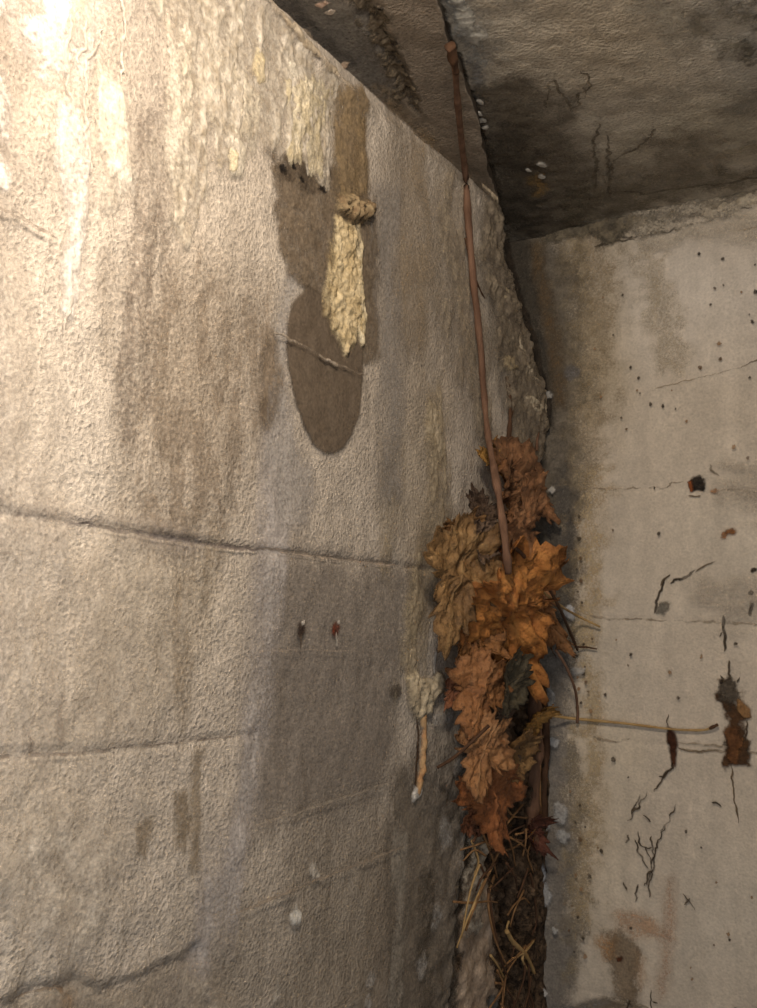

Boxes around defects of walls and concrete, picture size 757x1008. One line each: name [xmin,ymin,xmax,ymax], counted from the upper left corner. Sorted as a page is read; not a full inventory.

crack [544,71,592,112]
crack [591,124,656,198]
spalling [467,183,550,462]
crack [0,510,46,521]
water stain [0,0,451,1008]
crack [71,518,398,566]
water stain [445,0,757,1008]
crack [592,562,713,622]